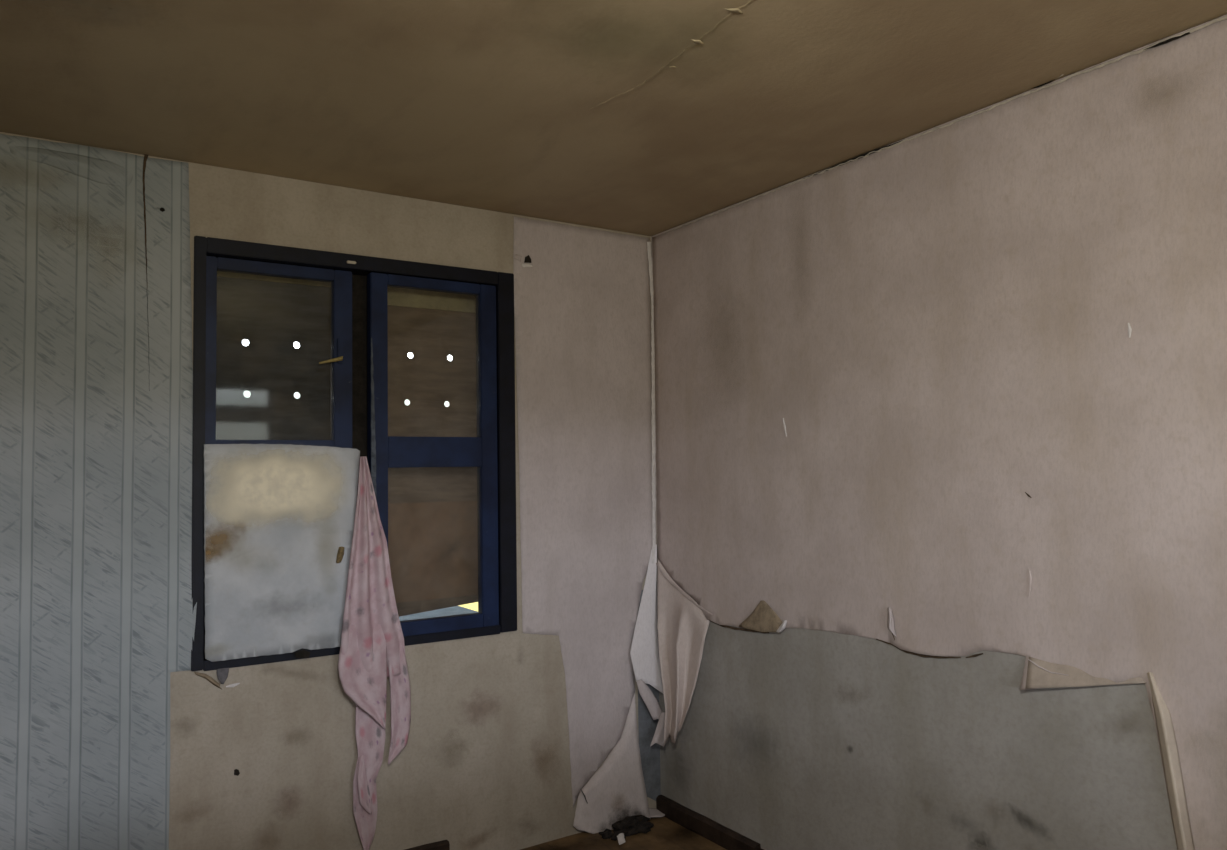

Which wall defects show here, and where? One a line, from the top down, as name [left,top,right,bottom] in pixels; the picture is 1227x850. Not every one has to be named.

crack [142,155,150,338]
peeling [638,607,1177,850]